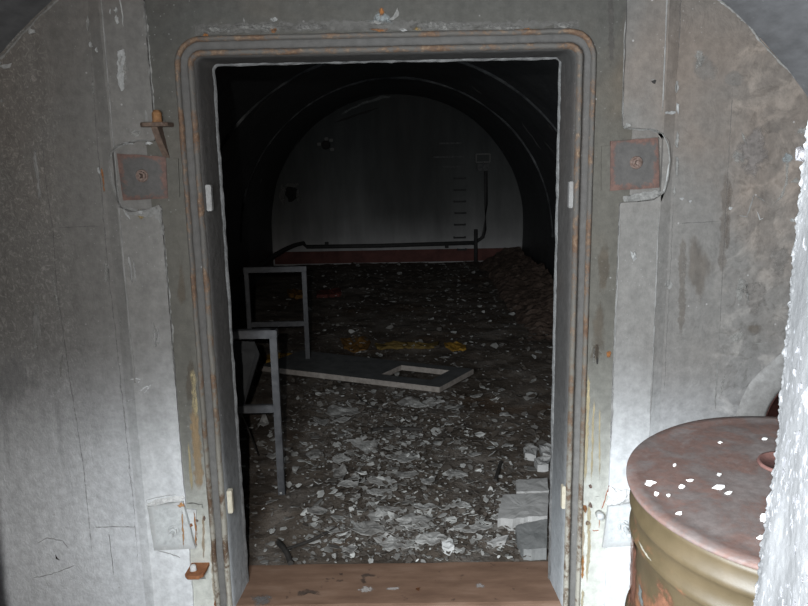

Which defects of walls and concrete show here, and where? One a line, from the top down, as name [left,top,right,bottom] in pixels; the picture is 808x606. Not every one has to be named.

spalling [100,0,176,383]
rust [190,373,198,415]
rust [584,379,600,488]
rust [581,502,600,578]